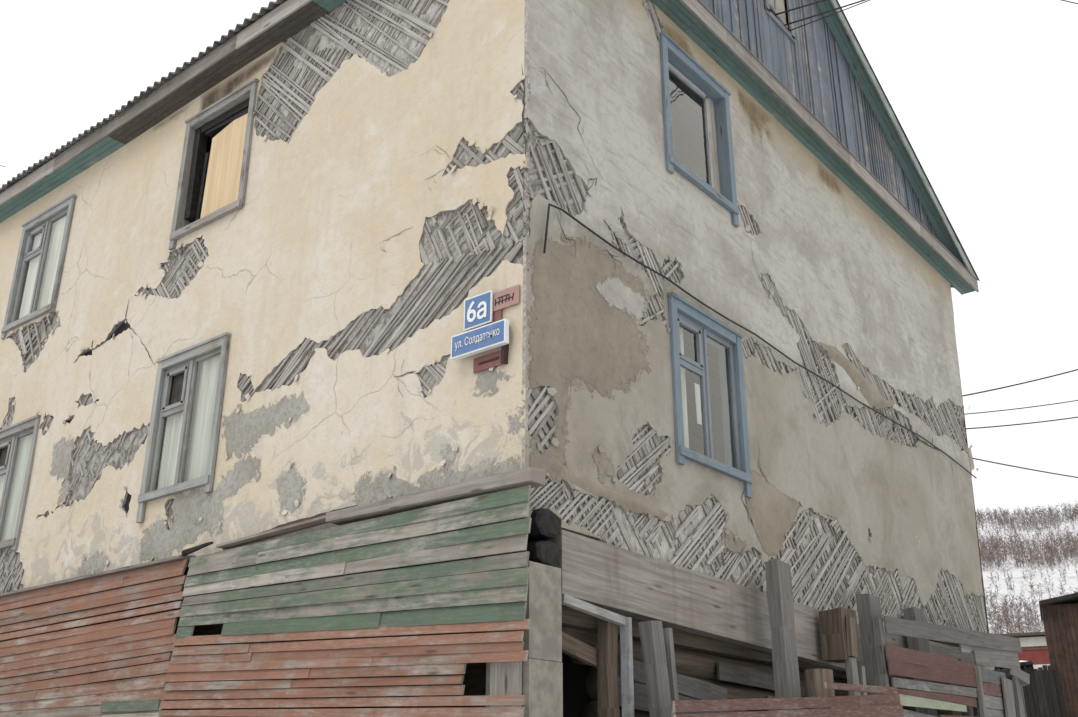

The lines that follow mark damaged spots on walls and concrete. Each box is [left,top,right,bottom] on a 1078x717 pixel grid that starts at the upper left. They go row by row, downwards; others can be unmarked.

peeling [472,198,493,220]
crack [75,301,160,369]
flaking render [40,394,149,517]
peeling [745,467,803,556]
flaking render [0,547,24,593]